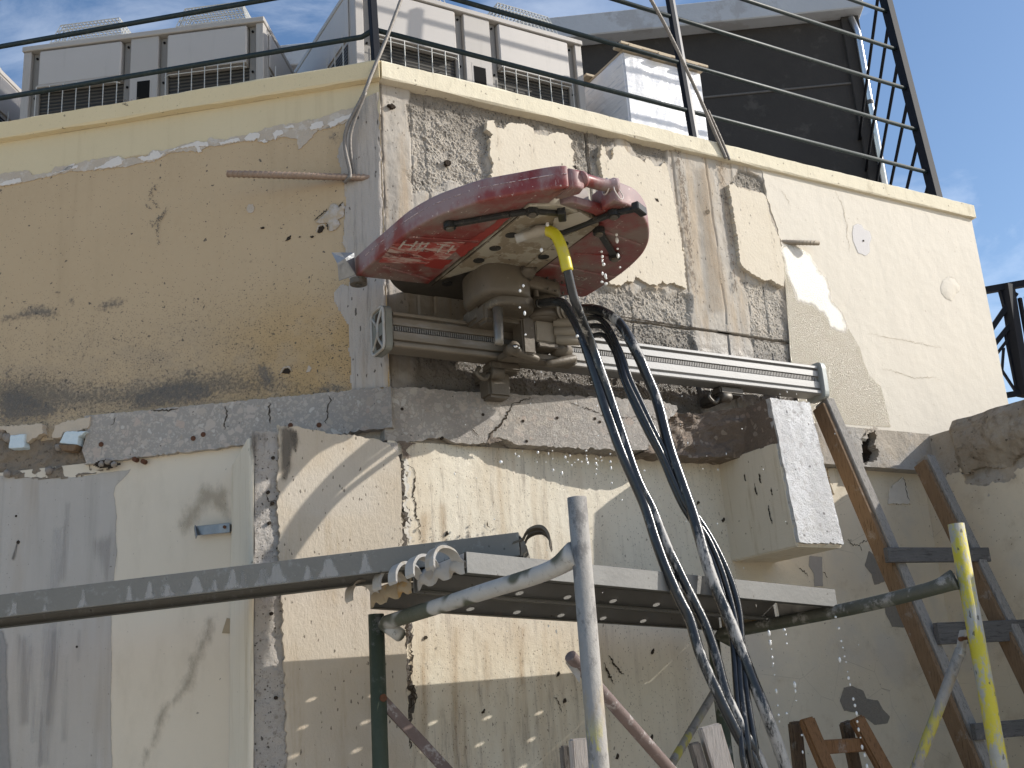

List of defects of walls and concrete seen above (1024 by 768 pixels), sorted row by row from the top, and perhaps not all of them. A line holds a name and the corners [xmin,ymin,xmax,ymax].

spalling [0,84,820,363]
spalling [334,275,485,392]
crack [472,398,530,441]
spalling [509,368,597,398]
flaking render [0,416,130,595]
crack [398,454,421,546]
flaking render [0,616,112,768]
crack [405,623,418,749]